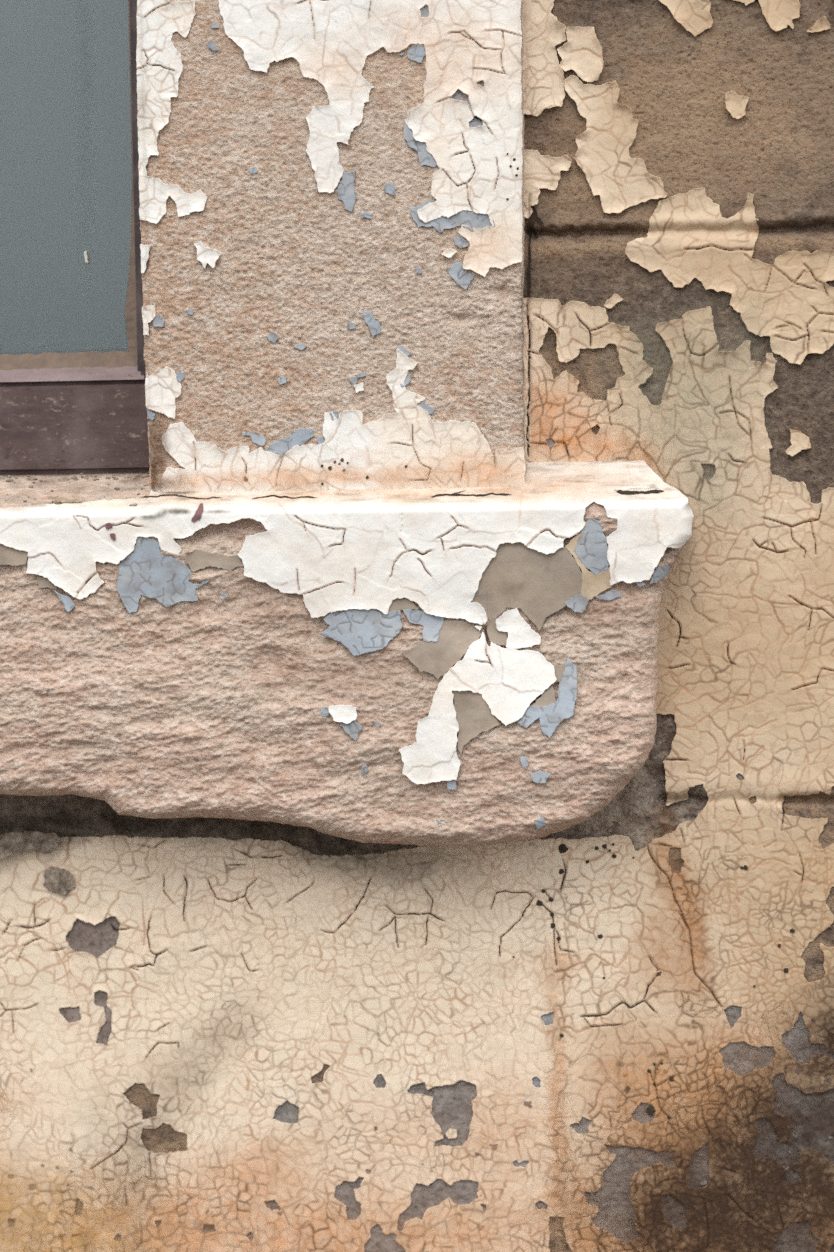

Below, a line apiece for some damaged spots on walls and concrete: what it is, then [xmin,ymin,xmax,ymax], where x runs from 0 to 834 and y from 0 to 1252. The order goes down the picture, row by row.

peeling [0,0,834,790]
crack [88,458,221,531]
crack [243,460,345,546]
crack [616,487,663,495]
peeling [66,916,120,958]
crack [110,841,280,970]
peeling [94,990,112,1046]
crack [581,957,658,1027]
peeling [122,1083,188,1153]
peeling [408,1080,498,1157]
leakage [631,1009,834,1252]
peeling [355,1163,487,1252]